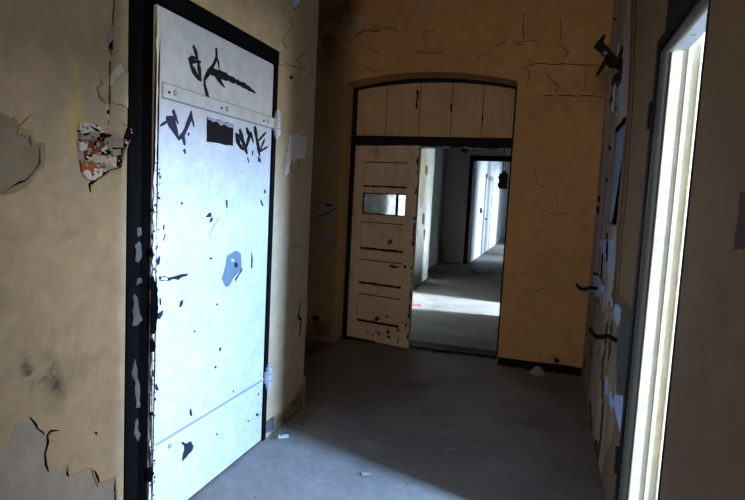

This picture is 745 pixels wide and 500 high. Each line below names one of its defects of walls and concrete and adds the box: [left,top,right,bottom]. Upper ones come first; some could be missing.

crack [523,63,604,97]
peeling [0,112,45,196]
flaking render [77,122,133,193]
peeling [285,133,308,176]
peeling [581,0,636,474]
peeling [0,422,117,500]